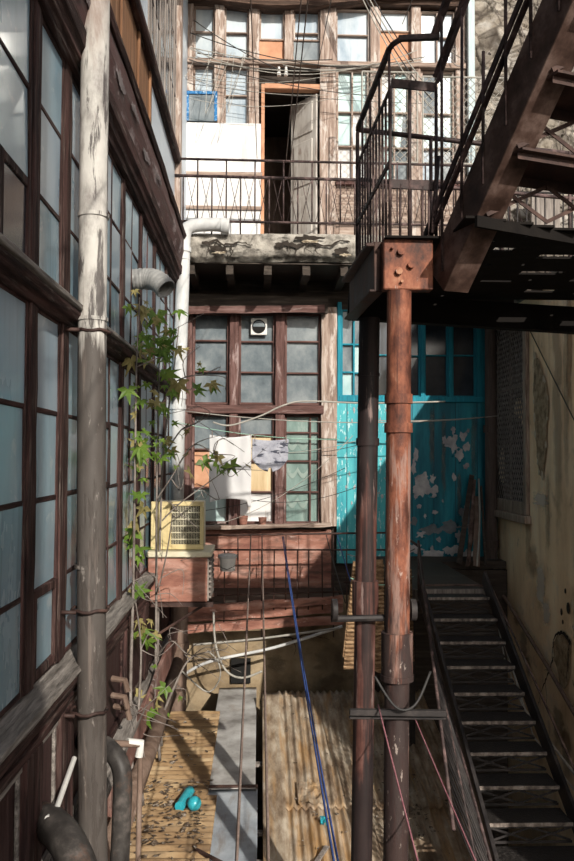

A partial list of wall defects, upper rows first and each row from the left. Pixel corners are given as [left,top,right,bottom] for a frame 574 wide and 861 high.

peeling [410,448,473,556]
peeling [442,426,470,481]
spalling [552,588,571,689]